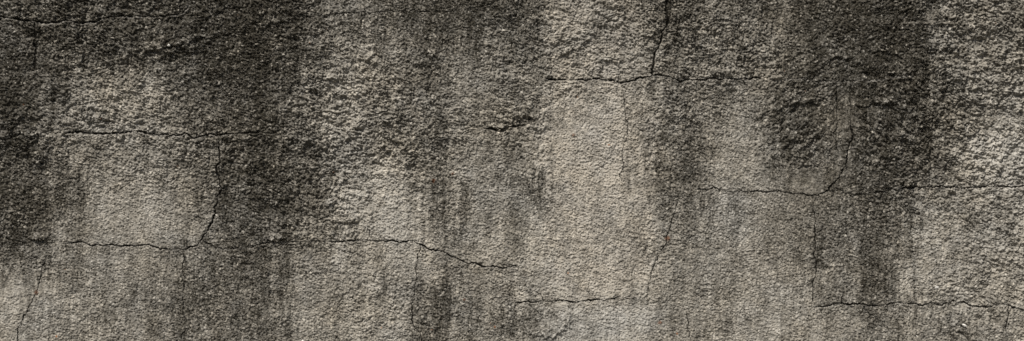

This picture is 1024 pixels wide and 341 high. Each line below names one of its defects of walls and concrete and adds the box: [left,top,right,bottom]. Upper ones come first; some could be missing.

crack [2,130,518,341]
water stain [0,0,545,341]
crack [484,123,524,131]
crack [545,0,760,181]
crack [515,75,1024,331]
water stain [641,0,970,339]
water stain [933,313,978,341]